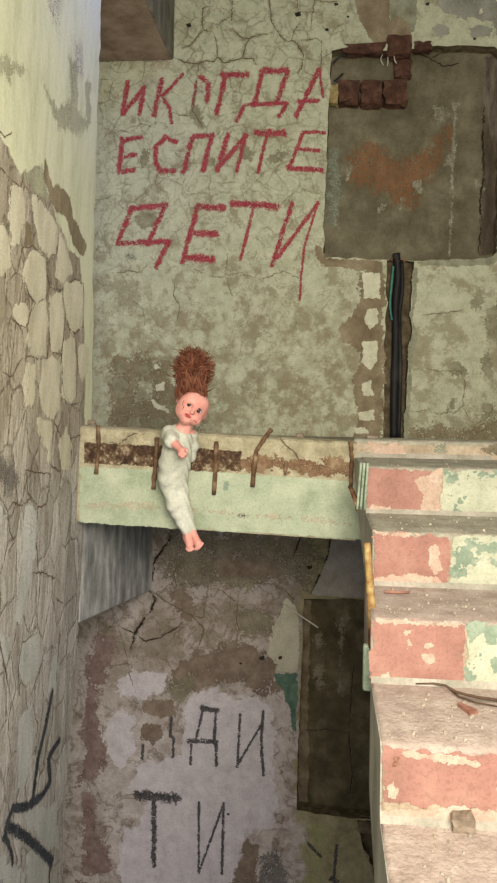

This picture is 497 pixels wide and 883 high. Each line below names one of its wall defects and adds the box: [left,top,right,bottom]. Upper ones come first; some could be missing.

crack [122,0,337,133]
spalling [337,0,497,110]
crack [0,167,84,405]
crack [198,254,302,296]
peeling [315,245,393,438]
spalling [403,247,497,438]
crack [1,424,80,603]
flaking render [0,137,89,883]
crack [108,534,332,693]
peeling [374,544,444,583]
crack [0,632,60,755]
flaking render [102,638,299,770]